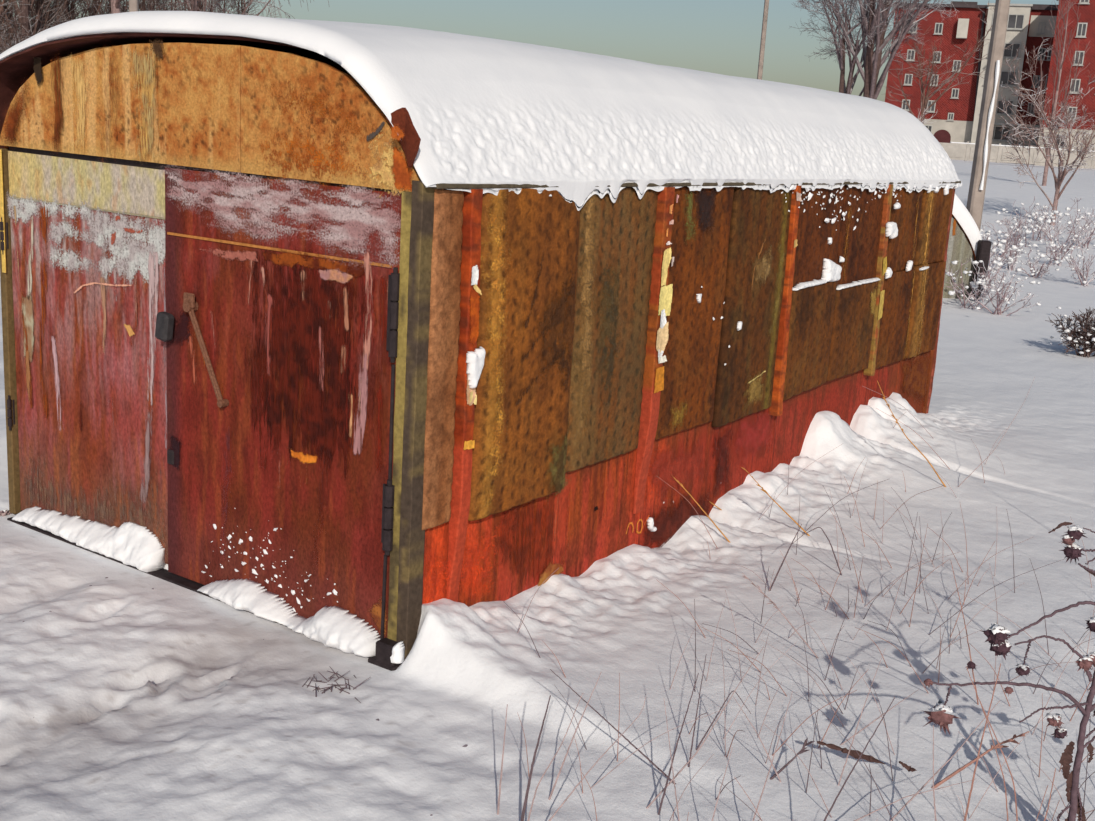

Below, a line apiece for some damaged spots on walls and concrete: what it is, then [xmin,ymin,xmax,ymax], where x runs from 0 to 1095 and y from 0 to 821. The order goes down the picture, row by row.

corrosion [51,57,64,150]
corrosion [257,79,373,186]
corrosion [391,124,412,191]
corrosion [21,205,48,420]
peeling [6,192,167,502]
corrosion [111,216,142,245]
peeling [163,130,402,455]
corrosion [245,245,374,521]
peeling [466,377,477,406]
peeling [471,265,482,295]
peeling [654,194,679,393]
corrosion [644,425,733,549]